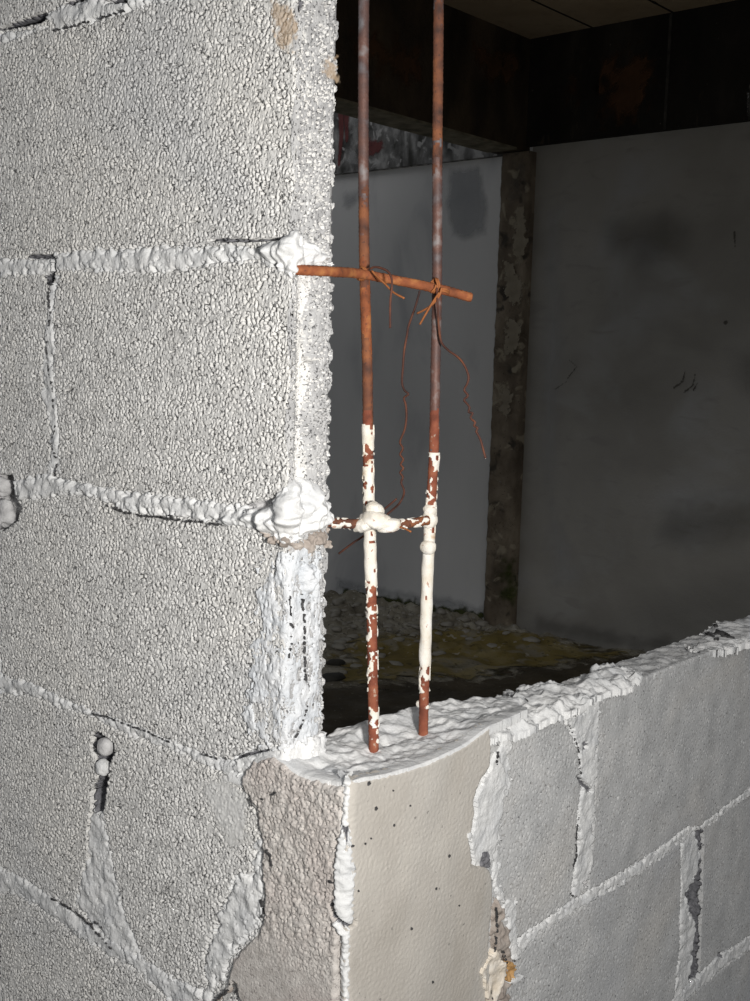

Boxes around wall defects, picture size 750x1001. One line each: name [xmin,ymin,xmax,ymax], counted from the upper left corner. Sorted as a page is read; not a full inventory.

rust [355,32,421,85]
water stain [450,170,484,234]
flaking render [501,205,529,307]